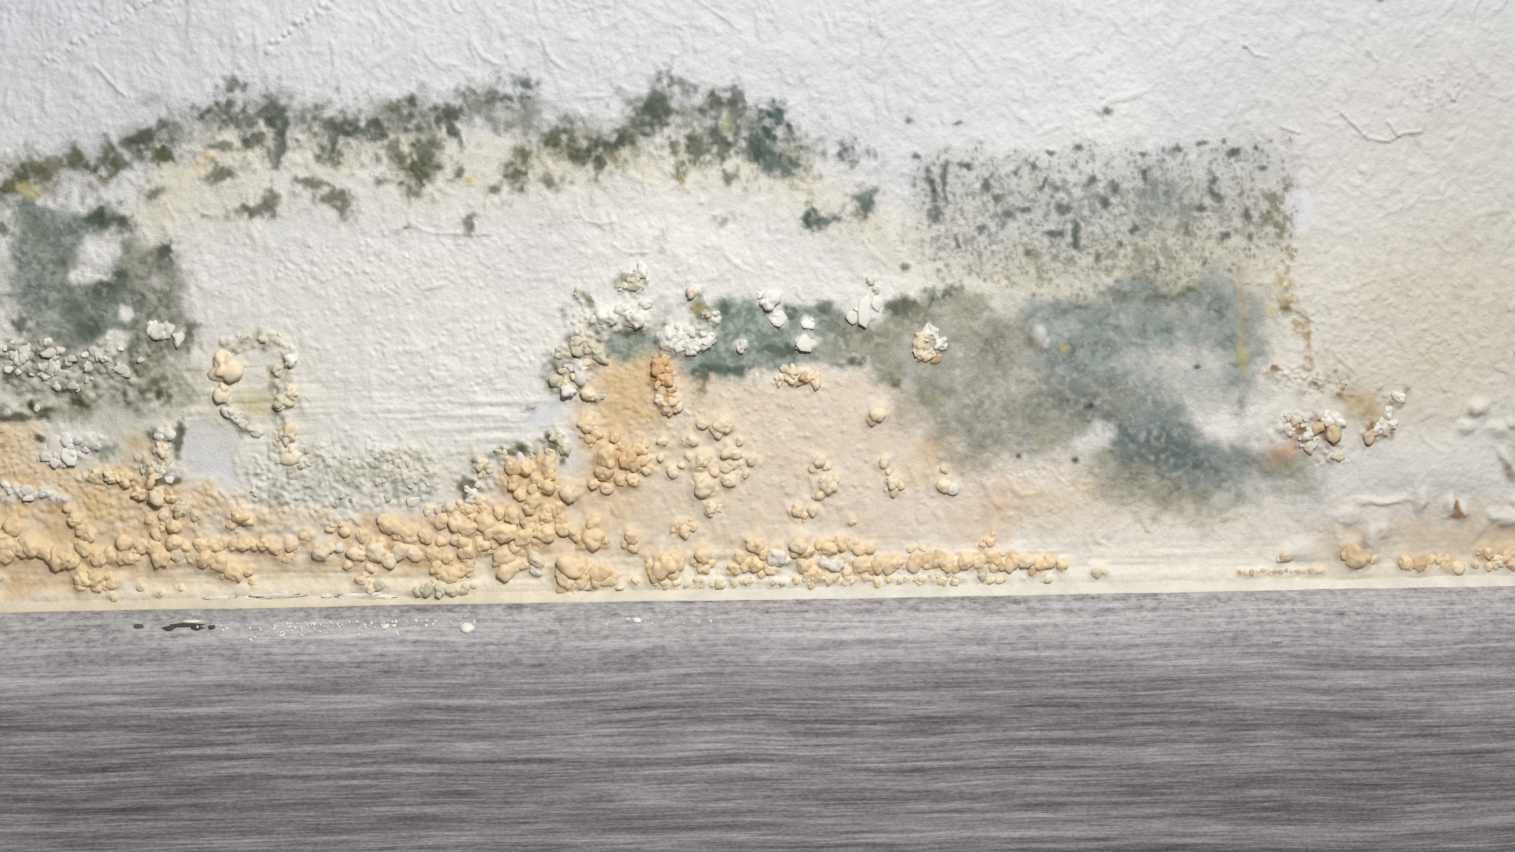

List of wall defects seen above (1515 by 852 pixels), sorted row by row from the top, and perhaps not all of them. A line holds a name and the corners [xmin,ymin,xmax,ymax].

water stain [0,43,1515,591]
water stain [0,556,354,603]
water stain [476,564,551,594]